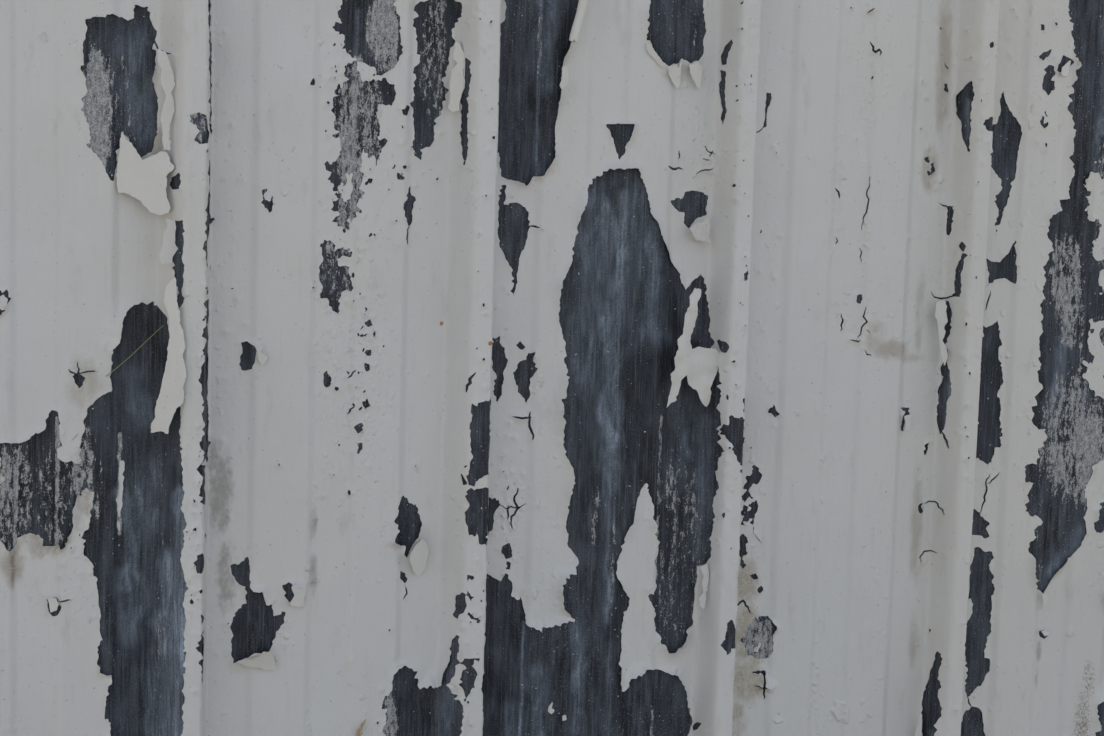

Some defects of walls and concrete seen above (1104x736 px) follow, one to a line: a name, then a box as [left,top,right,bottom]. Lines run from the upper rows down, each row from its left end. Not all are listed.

peeling [0,0,221,736]
peeling [224,550,310,670]
peeling [310,0,589,459]
peeling [374,117,767,736]
peeling [638,0,712,89]
peeling [956,0,1104,736]